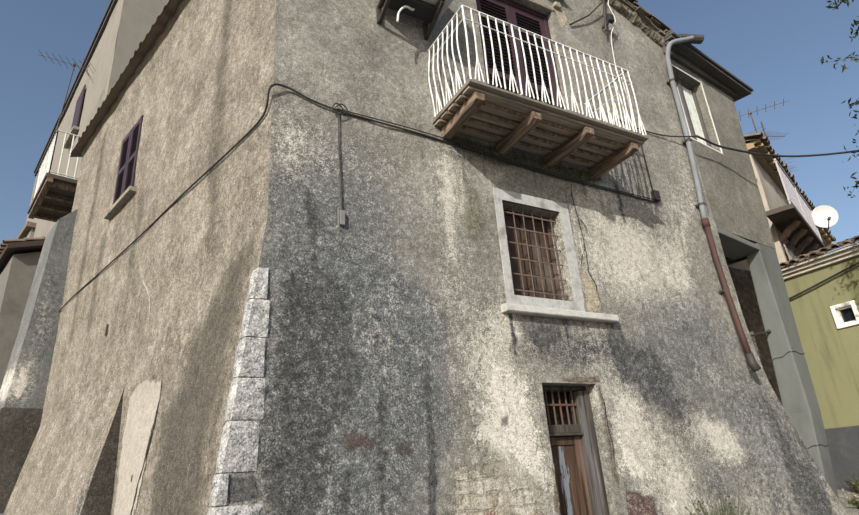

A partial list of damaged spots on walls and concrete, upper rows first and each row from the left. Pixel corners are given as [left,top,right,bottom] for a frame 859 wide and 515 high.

damp [305,191,317,244]
crack [570,181,602,306]
damp [266,277,360,515]
damp [424,374,437,515]
flaking render [441,450,560,515]
peeling [562,376,658,515]